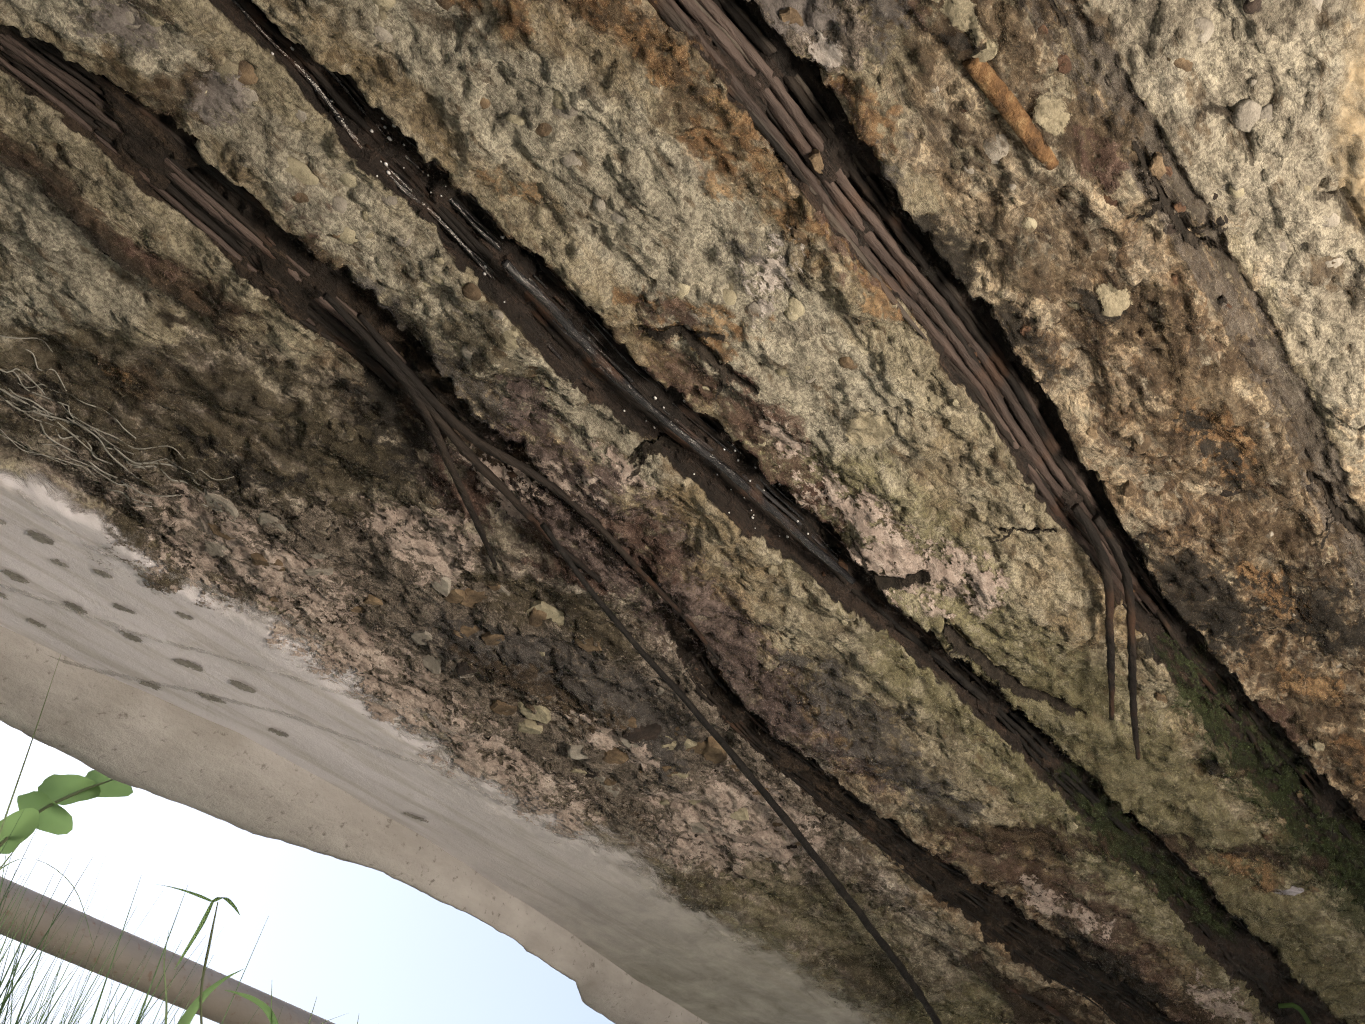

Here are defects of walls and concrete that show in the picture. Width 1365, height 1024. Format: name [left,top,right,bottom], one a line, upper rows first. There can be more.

spalling [746,0,892,80]
peeling [925,0,999,60]
rust [962,42,1059,170]
peeling [1032,54,1072,136]
crack [1316,190,1365,235]
leakage [0,126,442,522]
leakage [349,267,657,522]
crack [638,325,759,401]
rust [602,286,849,548]
peeling [1096,282,1133,317]
leakage [981,208,1365,821]
rust [406,411,912,804]